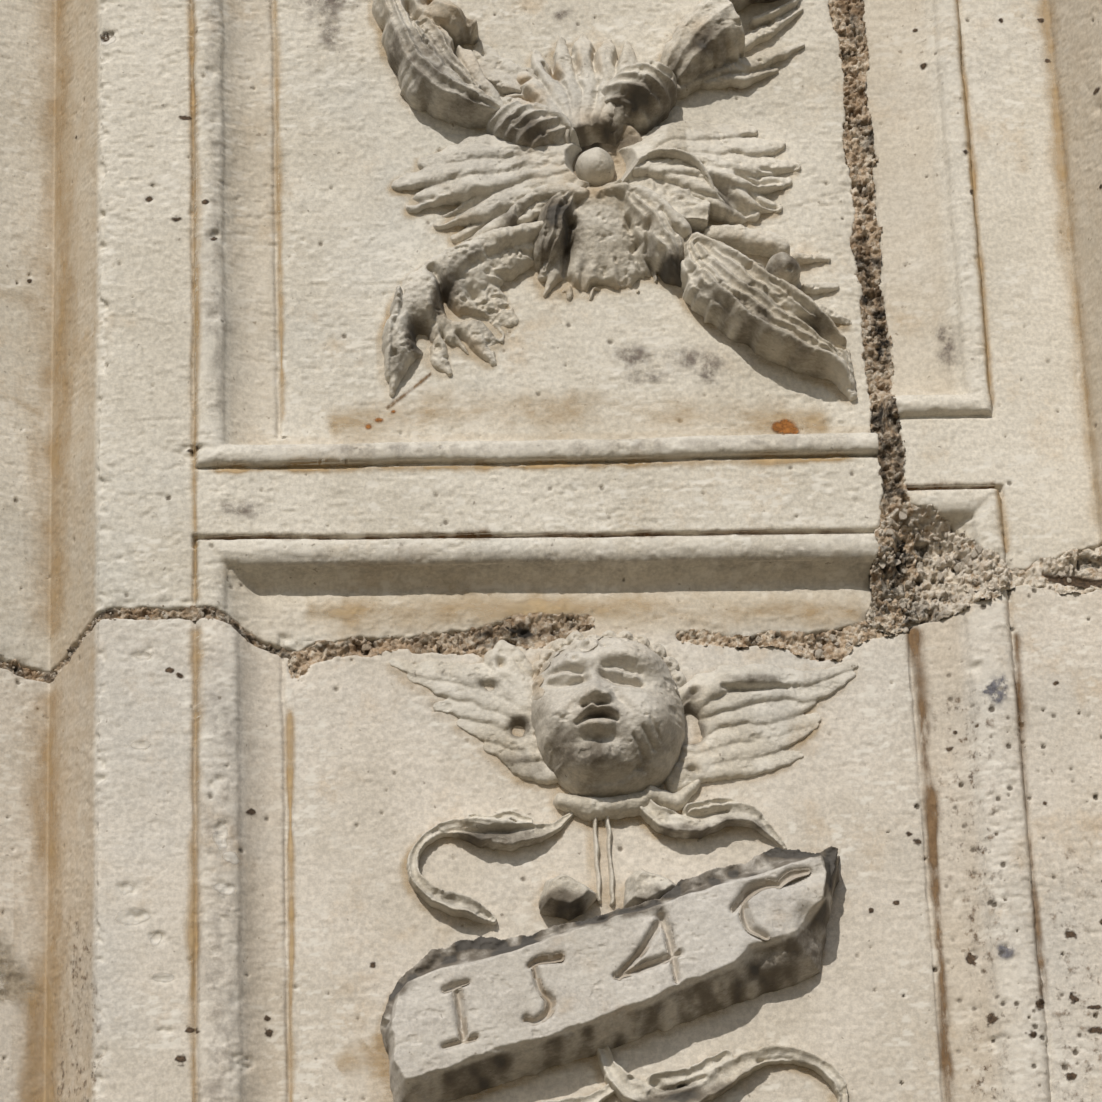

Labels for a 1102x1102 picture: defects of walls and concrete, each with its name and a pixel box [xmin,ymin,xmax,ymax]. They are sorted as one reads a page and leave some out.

crack [829,0,919,634]
crack [387,373,431,409]
corrosion [772,419,799,434]
spalling [676,504,1102,662]
crack [0,605,296,683]